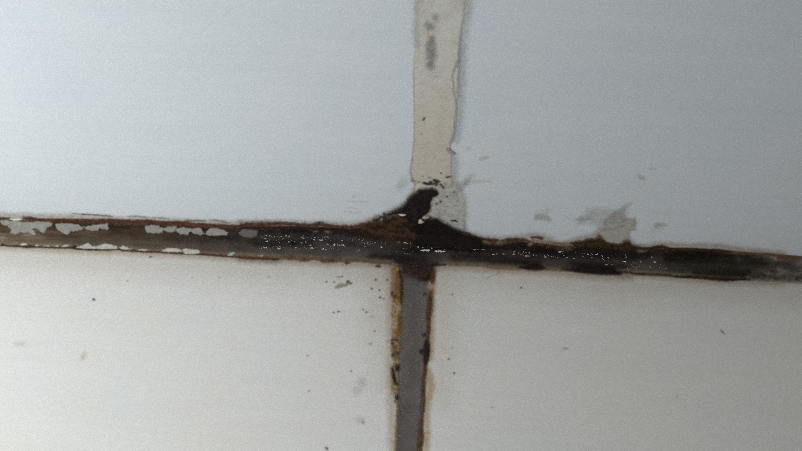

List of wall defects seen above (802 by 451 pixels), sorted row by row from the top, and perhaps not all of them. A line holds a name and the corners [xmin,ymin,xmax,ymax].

peeling [0,218,109,235]
peeling [145,225,228,236]
peeling [239,229,258,237]
water stain [370,231,801,282]